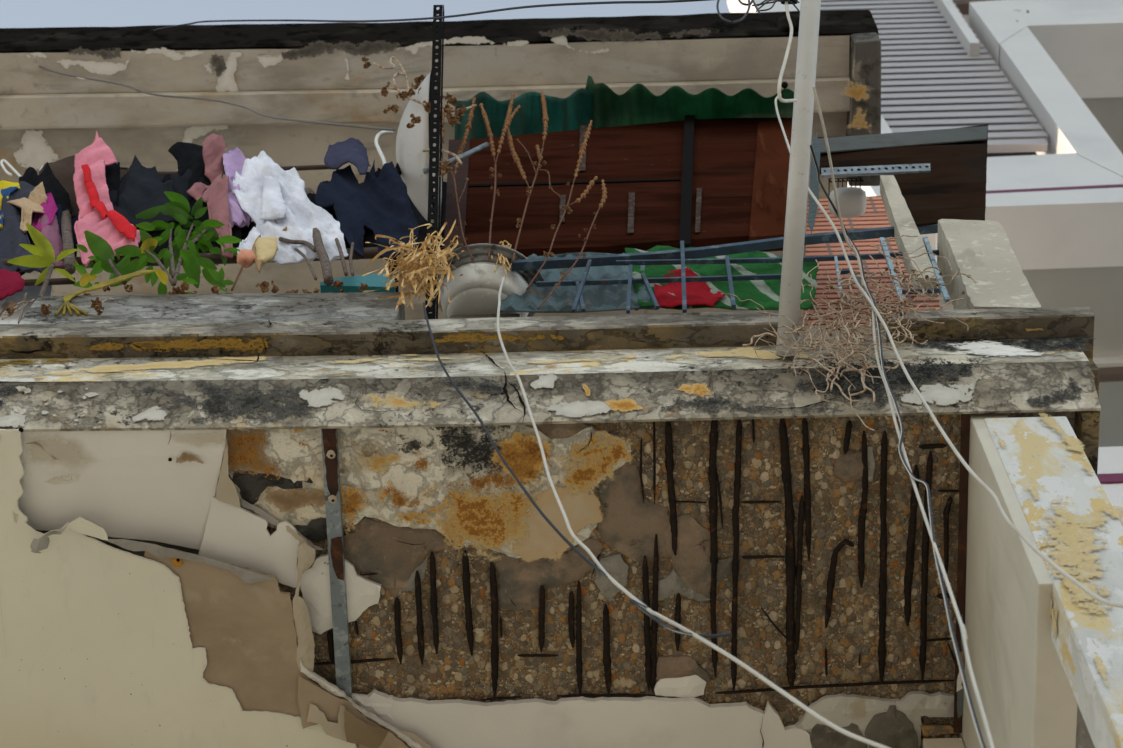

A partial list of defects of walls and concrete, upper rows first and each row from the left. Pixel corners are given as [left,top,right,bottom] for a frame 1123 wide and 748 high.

peeling [132,405,167,422]
damp [46,356,317,481]
peeling [299,386,345,408]
damp [328,354,463,364]
mould [396,425,511,477]
damp [440,378,504,394]
crack [481,351,526,421]
peeling [531,373,558,389]
damp [661,336,1095,417]
rust [266,428,633,581]
peeling [215,429,336,685]
spalling [337,382,975,748]